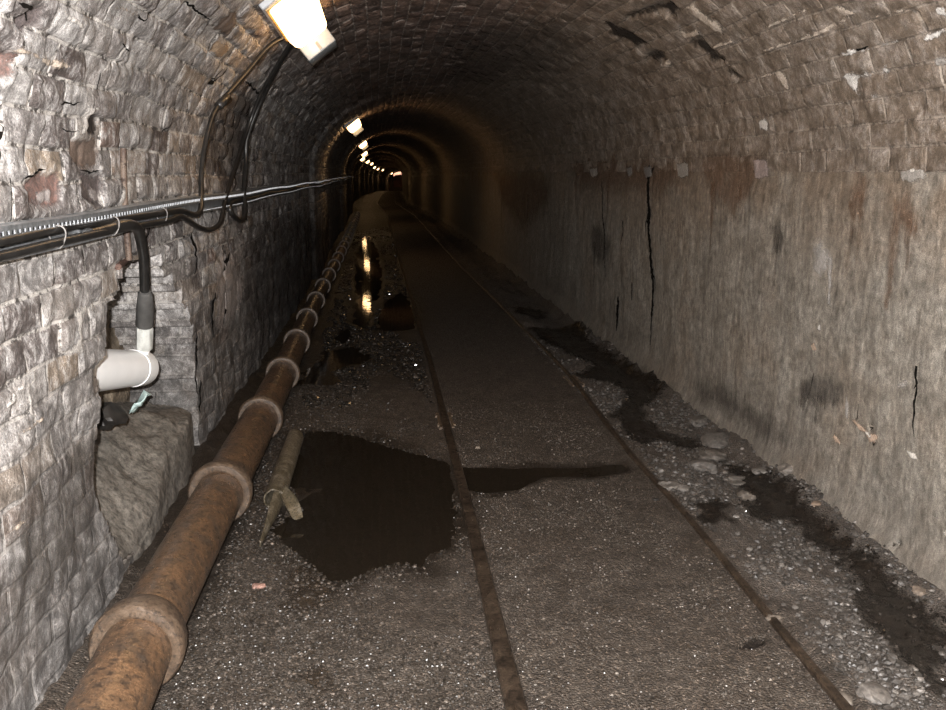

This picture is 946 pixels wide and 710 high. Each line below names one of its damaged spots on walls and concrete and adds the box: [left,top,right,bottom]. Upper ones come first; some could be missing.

spalling [606,21,646,46]
spalling [651,51,672,68]
spalling [629,1,733,61]
crack [601,166,655,344]
crack [911,366,919,434]